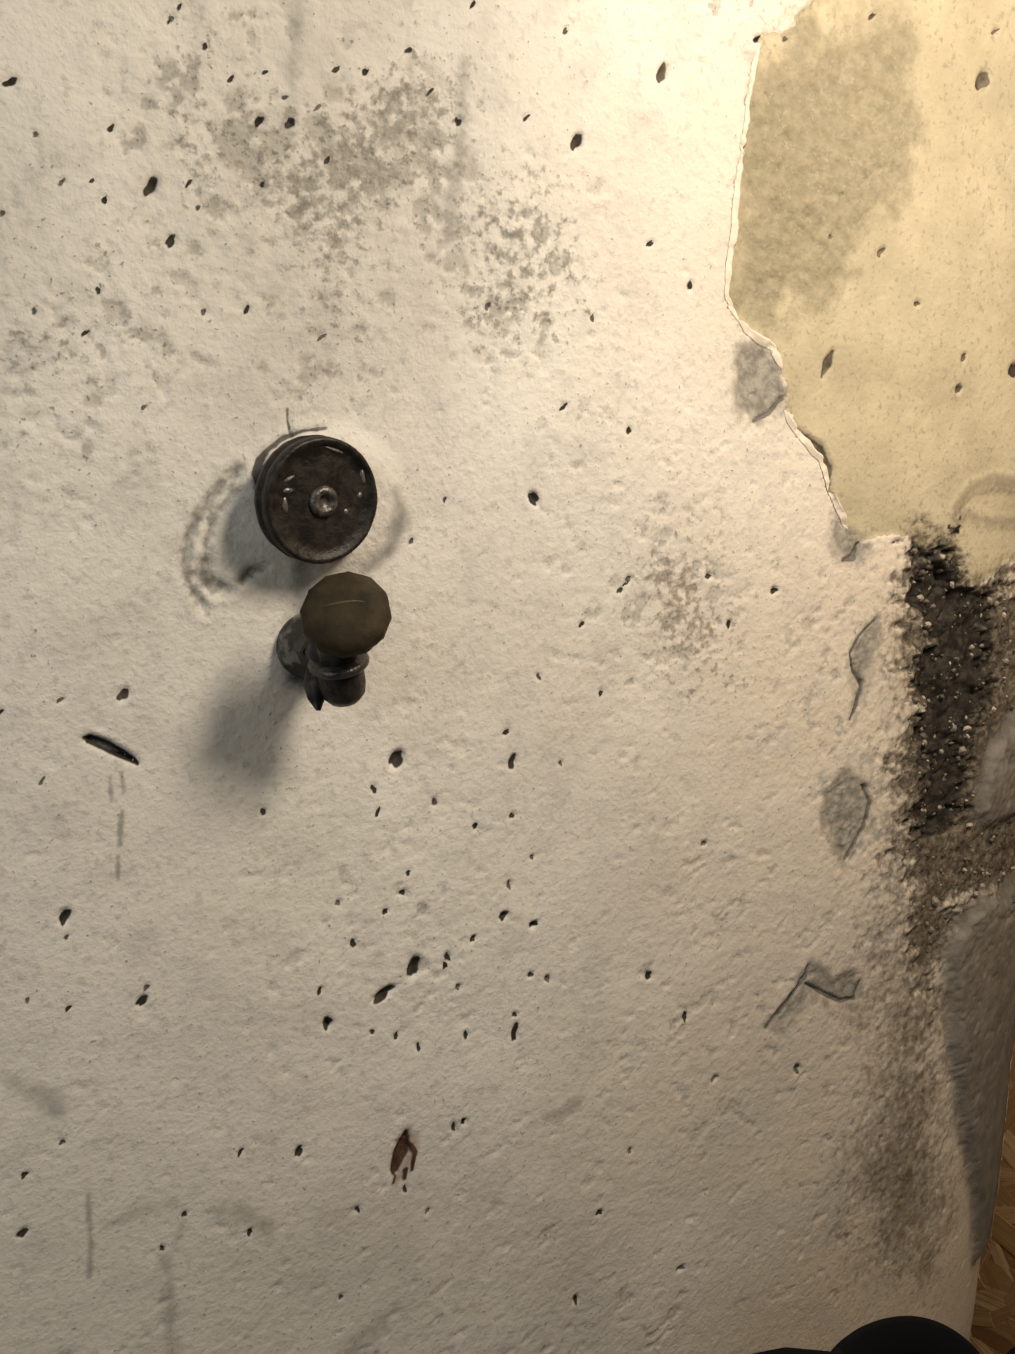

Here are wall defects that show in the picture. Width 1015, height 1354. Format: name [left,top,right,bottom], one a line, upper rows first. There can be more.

peeling [724,0,1015,992]
corrosion [391,1130,417,1184]
damp [865,954,945,1274]